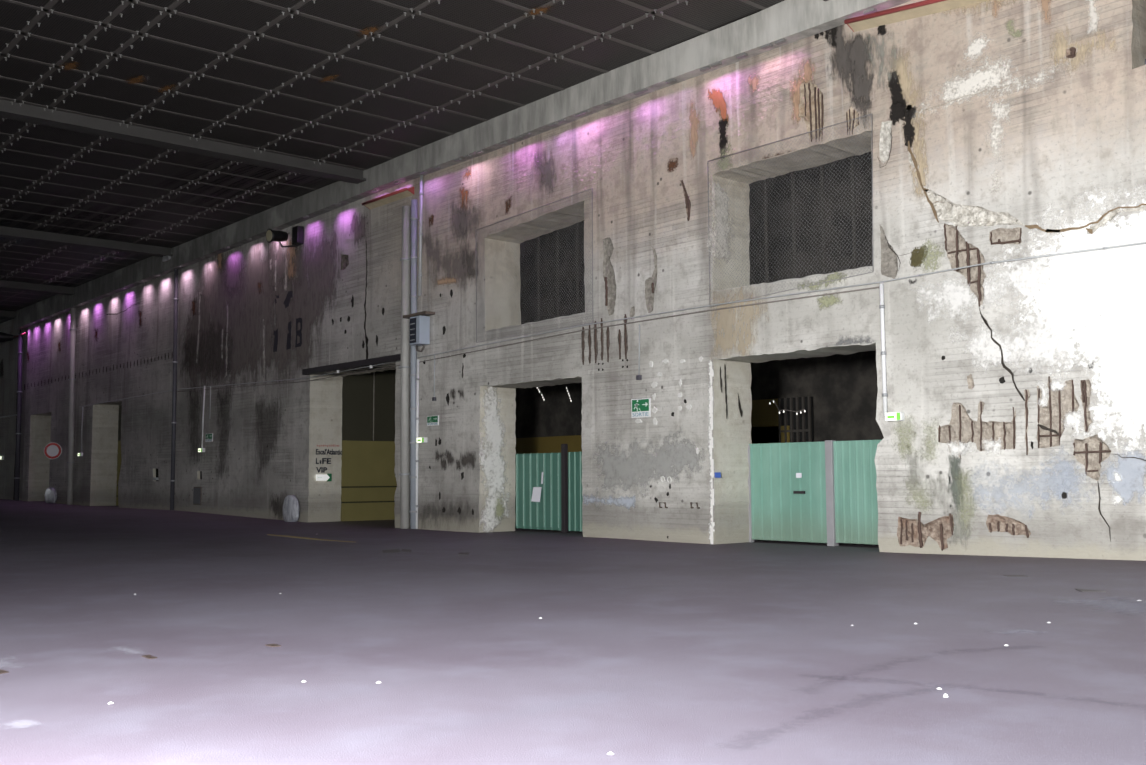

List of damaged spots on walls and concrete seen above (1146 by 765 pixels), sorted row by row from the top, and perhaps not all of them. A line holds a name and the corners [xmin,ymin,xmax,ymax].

rust [708,89,728,122]
damp [422,205,478,284]
crack [877,132,945,223]
spalling [926,190,1025,307]
crack [1025,203,1146,234]
damp [184,233,339,393]
crack [979,308,1059,435]
peeling [937,318,1111,481]
spalling [897,512,954,551]
damp [949,457,970,540]
spalling [986,514,1031,538]
crack [1098,483,1111,542]